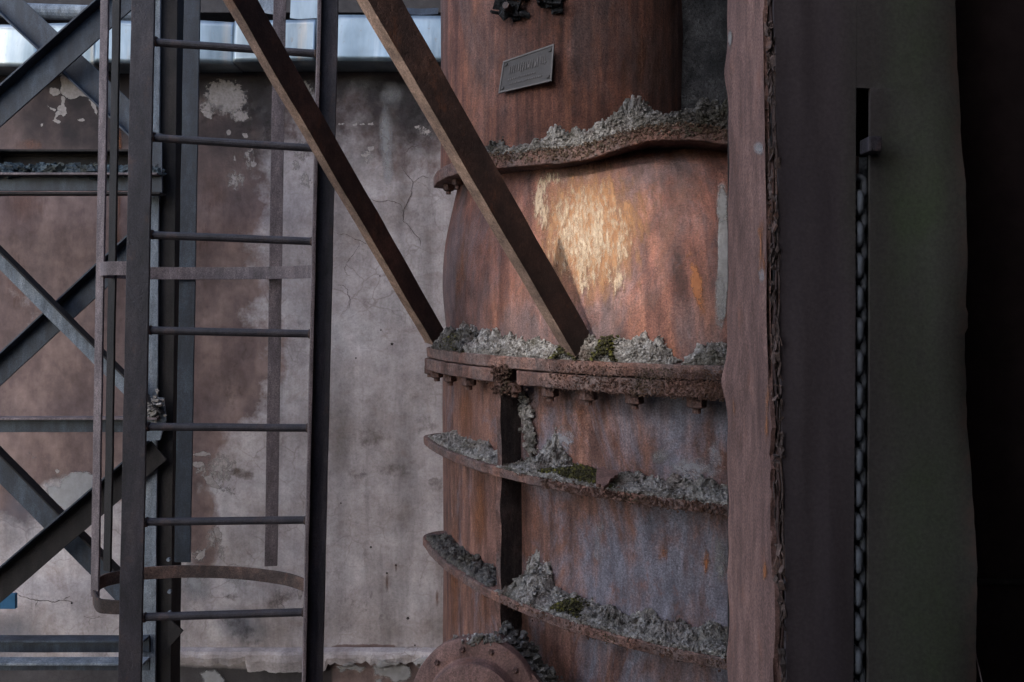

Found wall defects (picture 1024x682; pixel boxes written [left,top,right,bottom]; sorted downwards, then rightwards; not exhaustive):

peeling [41,75,98,127]
peeling [199,78,257,190]
crack [372,145,428,246]
corrosion [690,264,704,315]